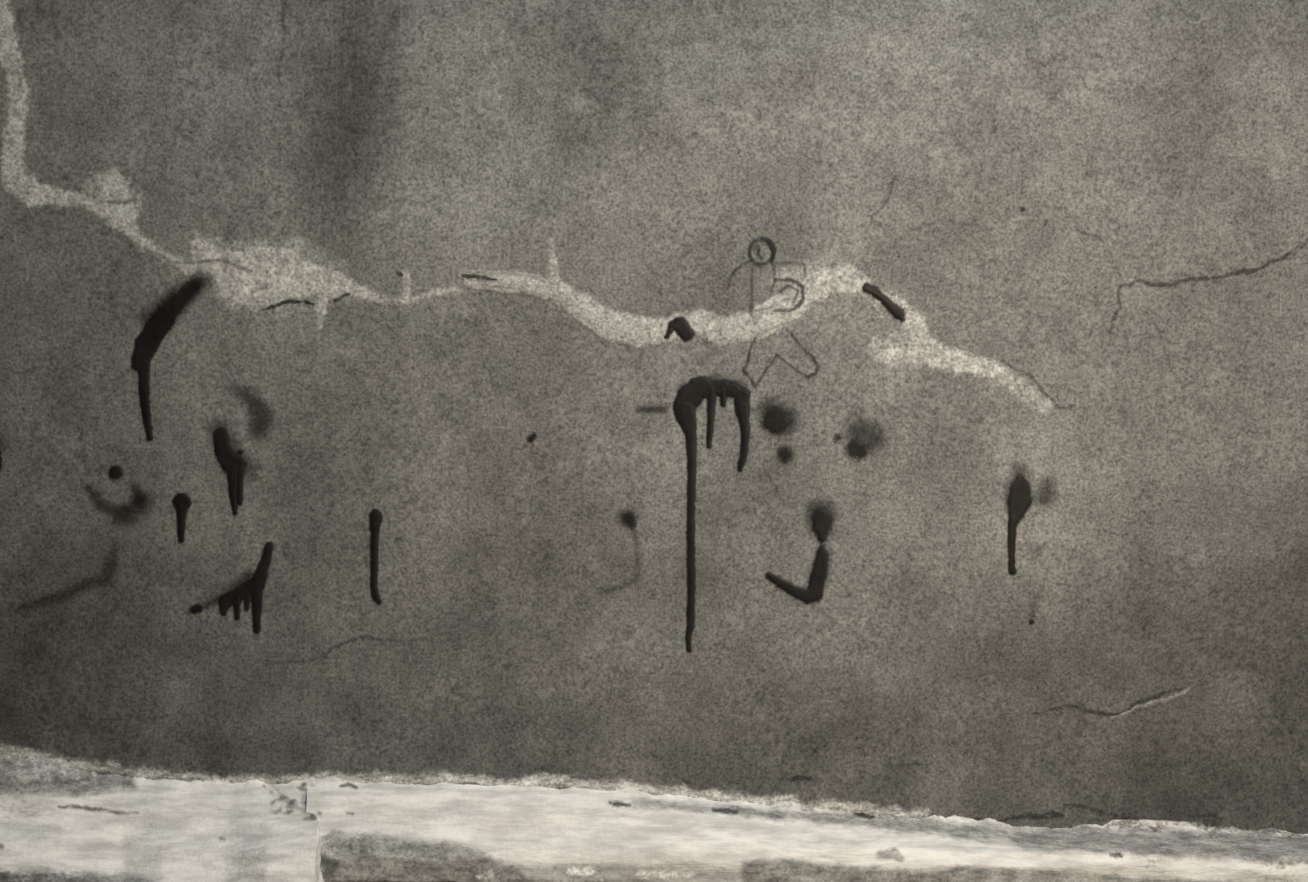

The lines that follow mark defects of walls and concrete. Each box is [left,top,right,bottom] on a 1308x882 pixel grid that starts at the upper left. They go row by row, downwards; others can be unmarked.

crack [0,0,1051,411]
crack [1138,244,1305,286]